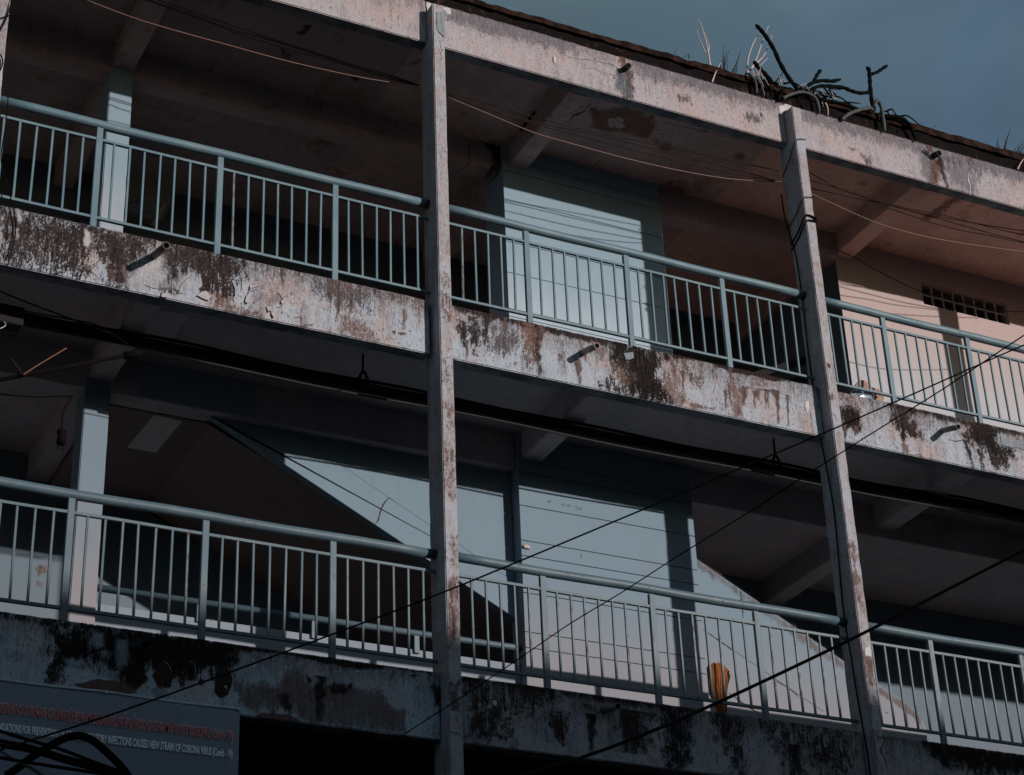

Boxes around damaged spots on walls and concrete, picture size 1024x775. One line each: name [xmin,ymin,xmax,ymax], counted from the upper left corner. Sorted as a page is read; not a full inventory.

damp [0,205,249,298]
peeling [127,256,211,301]
damp [306,275,410,319]
damp [454,306,791,423]
corrosion [725,367,744,418]
damp [839,402,862,439]
damp [888,402,1023,471]
damp [0,611,441,732]
damp [461,676,858,775]
mould [922,740,1024,775]